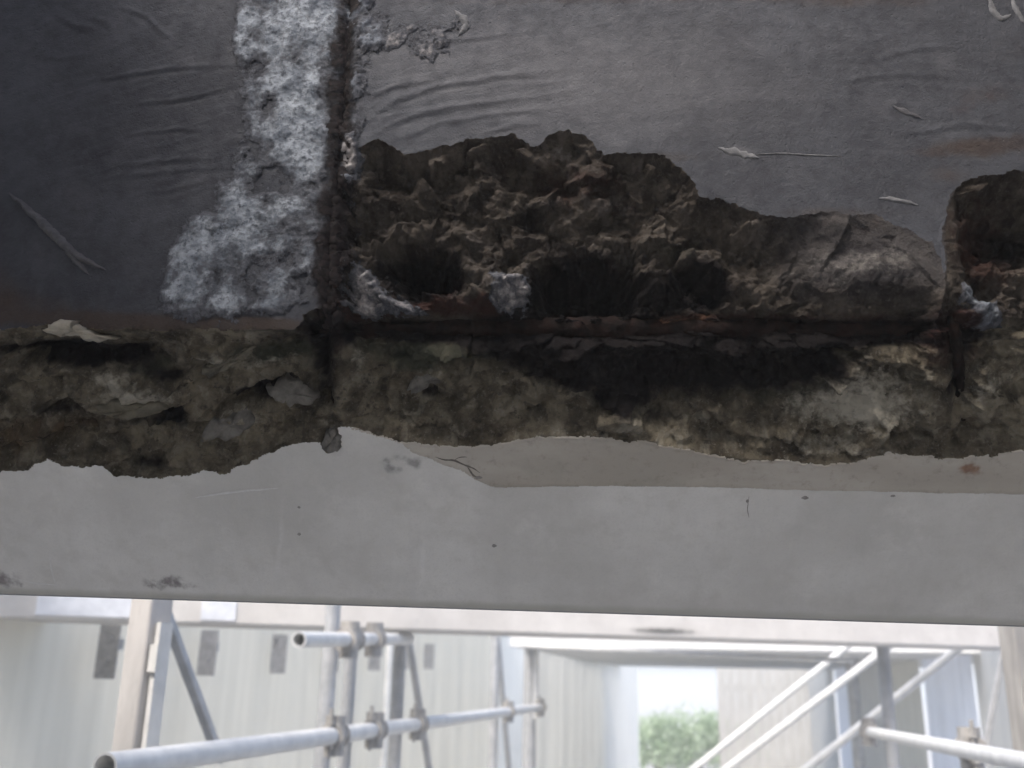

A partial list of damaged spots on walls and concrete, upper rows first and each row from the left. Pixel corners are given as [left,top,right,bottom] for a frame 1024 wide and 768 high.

water stain [71,0,462,331]
crack [436,457,480,477]
spalling [0,129,1024,503]